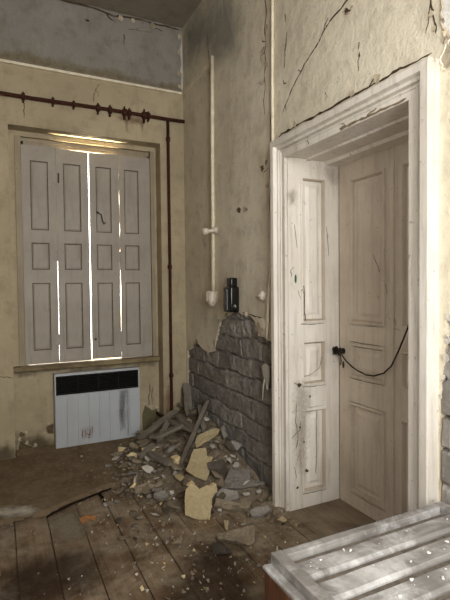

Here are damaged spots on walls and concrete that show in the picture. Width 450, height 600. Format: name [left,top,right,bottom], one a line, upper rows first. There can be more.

crack [61,0,179,44]
crack [260,0,431,142]
crack [425,0,437,34]
flaking render [439,0,450,72]
crack [262,159,270,212]
spalling [188,312,273,493]
spalling [439,335,450,505]